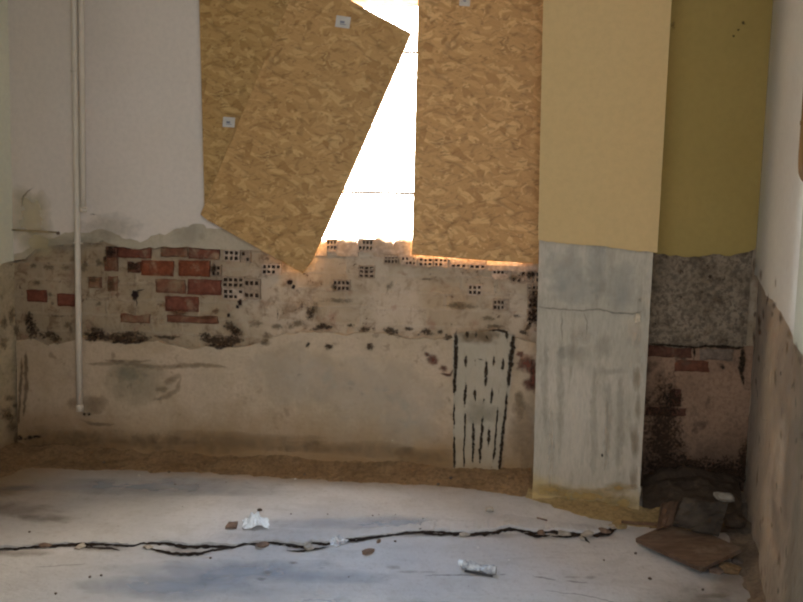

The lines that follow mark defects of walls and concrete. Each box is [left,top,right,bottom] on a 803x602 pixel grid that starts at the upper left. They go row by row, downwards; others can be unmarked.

peeling [0,0,295,324]
peeling [538,0,803,497]
flaking render [332,254,539,322]
water stain [2,308,62,342]
water stain [85,327,180,345]
water stain [198,320,244,350]
water stain [306,307,332,330]
water stain [384,327,452,340]
flaking render [483,298,509,328]
crack [0,514,617,556]